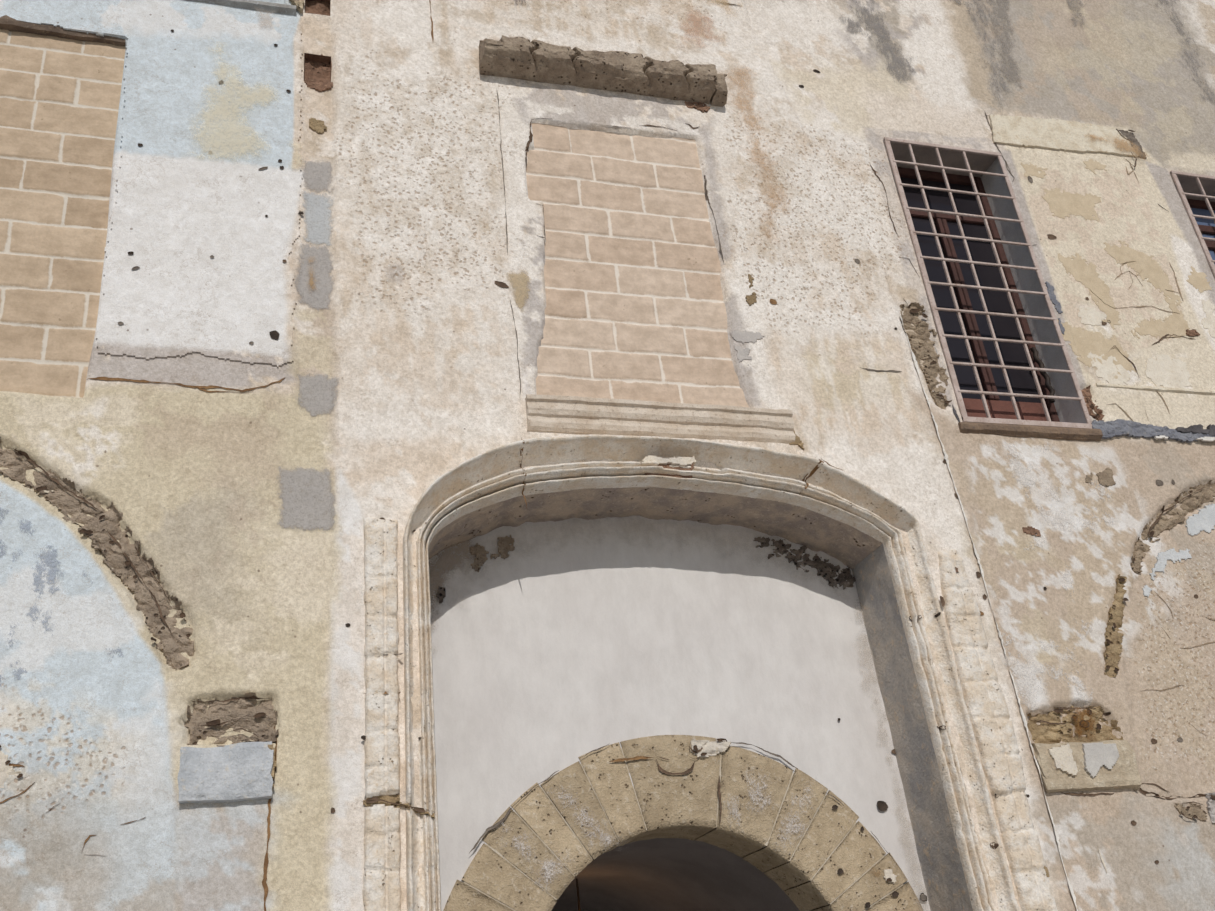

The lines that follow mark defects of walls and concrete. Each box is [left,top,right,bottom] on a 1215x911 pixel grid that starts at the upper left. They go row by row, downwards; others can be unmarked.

spalling [900,302,952,409]
spalling [1081,385,1105,421]
peeling [1057,240,1200,379]
crack [1091,261,1194,421]
crack [519,438,527,506]
crack [799,459,842,495]
spalling [0,437,195,670]
spalling [753,537,856,590]
spalling [1079,480,1215,677]
spalling [185,692,279,788]
spalling [1002,633,1123,744]
crack [262,726,277,911]